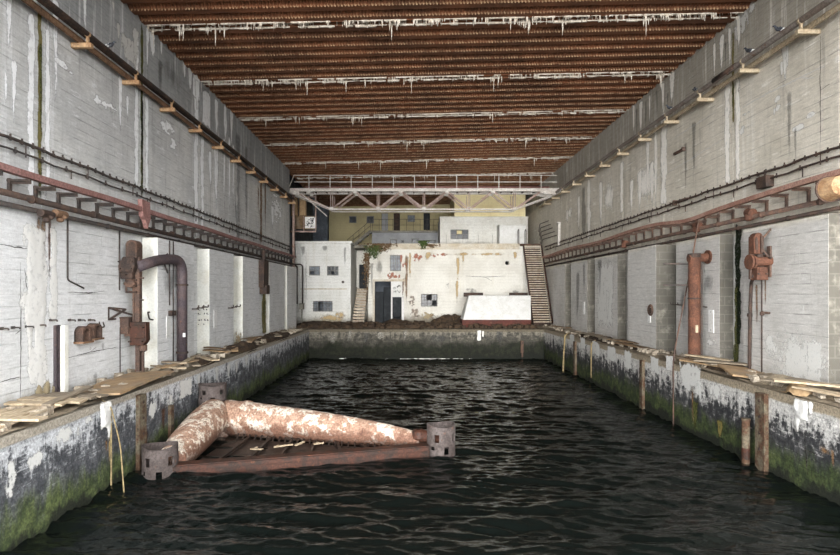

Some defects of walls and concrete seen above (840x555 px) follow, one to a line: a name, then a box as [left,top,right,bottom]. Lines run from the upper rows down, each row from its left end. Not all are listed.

water stain [713,16,741,76]
water stain [4,61,17,117]
water stain [27,13,35,195]
water stain [44,0,59,186]
water stain [724,78,740,184]
peeling [19,223,58,394]
peeling [570,335,632,370]
peeling [651,356,722,401]
peeling [793,398,813,432]